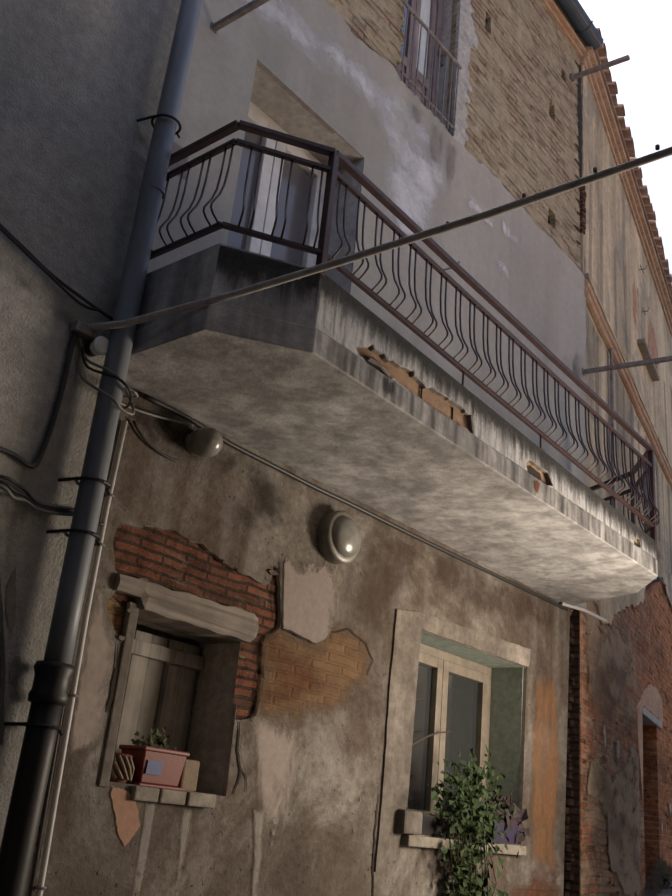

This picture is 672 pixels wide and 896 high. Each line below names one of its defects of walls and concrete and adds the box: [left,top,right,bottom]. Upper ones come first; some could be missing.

water stain [248,0,315,48]
water stain [328,46,441,236]
spalling [357,348,468,430]
spalling [526,462,555,493]
flaking render [106,592,136,641]
flaking render [113,524,374,720]